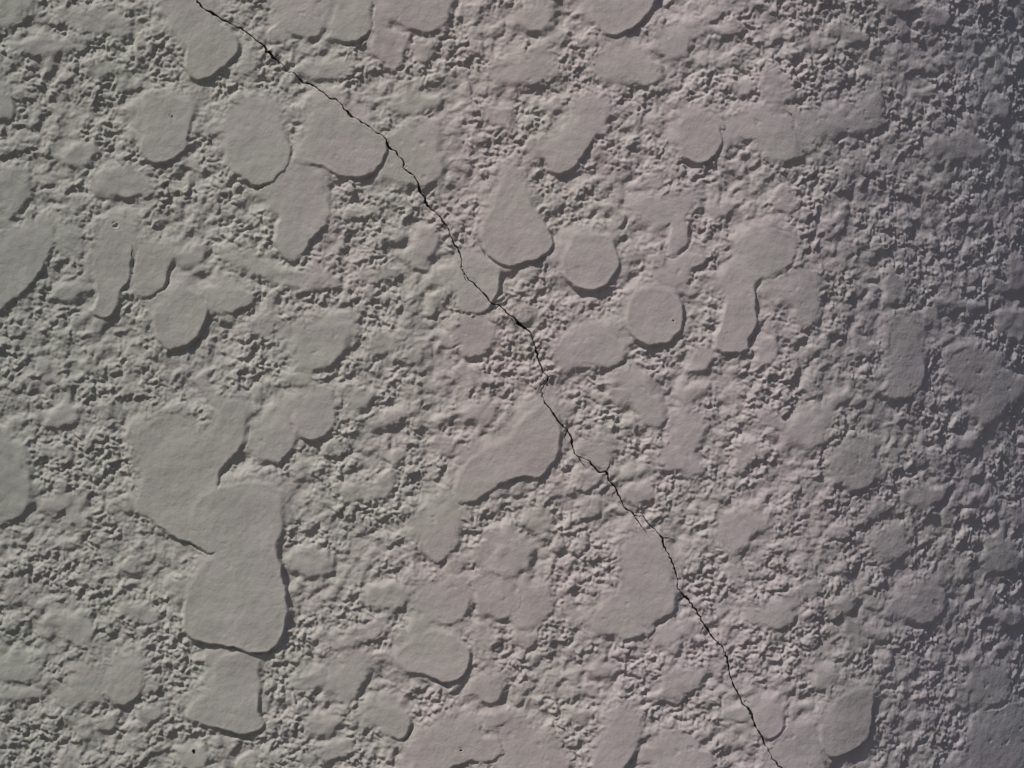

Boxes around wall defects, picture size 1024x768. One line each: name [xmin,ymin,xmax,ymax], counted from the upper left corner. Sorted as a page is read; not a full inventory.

crack [193,0,785,768]